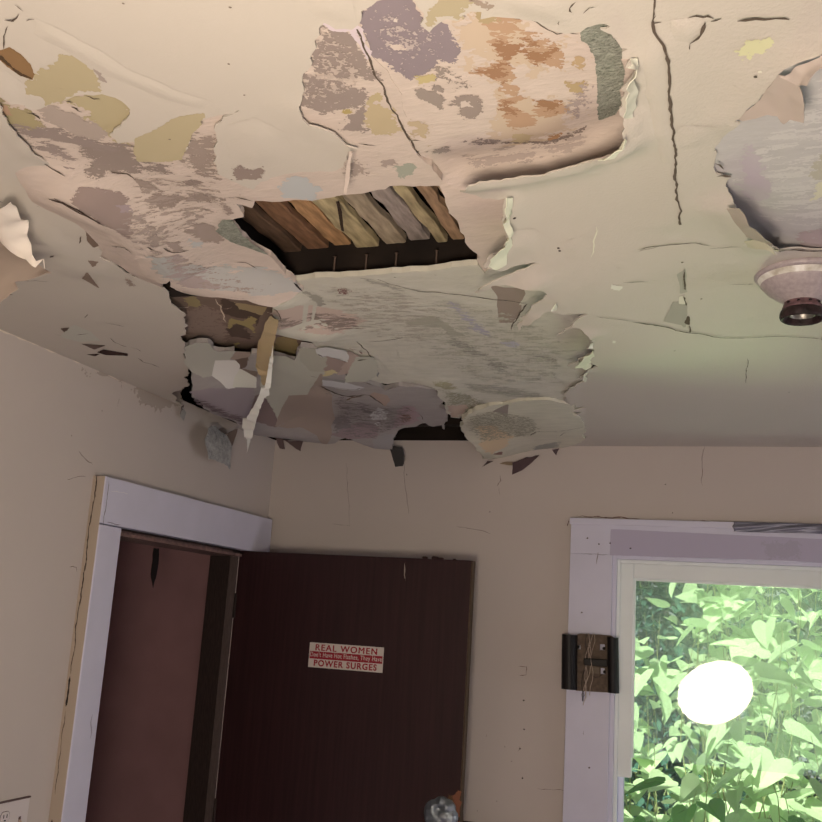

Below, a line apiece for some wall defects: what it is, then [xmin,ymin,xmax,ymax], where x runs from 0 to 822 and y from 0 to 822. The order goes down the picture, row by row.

flaking render [0,0,634,469]
crack [639,0,728,251]
crack [689,15,789,49]
flaking render [714,69,822,249]
flaking render [776,56,819,78]